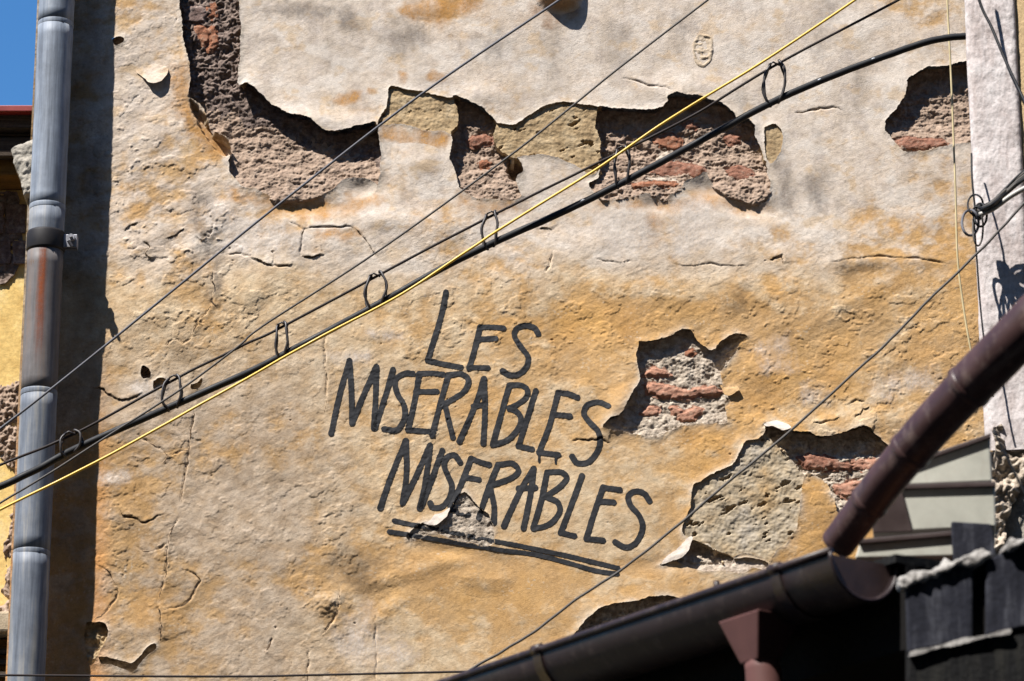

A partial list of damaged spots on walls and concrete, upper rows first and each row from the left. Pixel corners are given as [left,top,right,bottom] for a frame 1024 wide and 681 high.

flaking render [135,64,168,83]
flaking render [179,0,783,206]
flaking render [885,61,971,152]
crack [167,222,376,345]
flaking render [603,329,747,438]
flaking render [406,492,494,546]
flaking render [660,420,888,573]
flaking render [574,595,678,634]